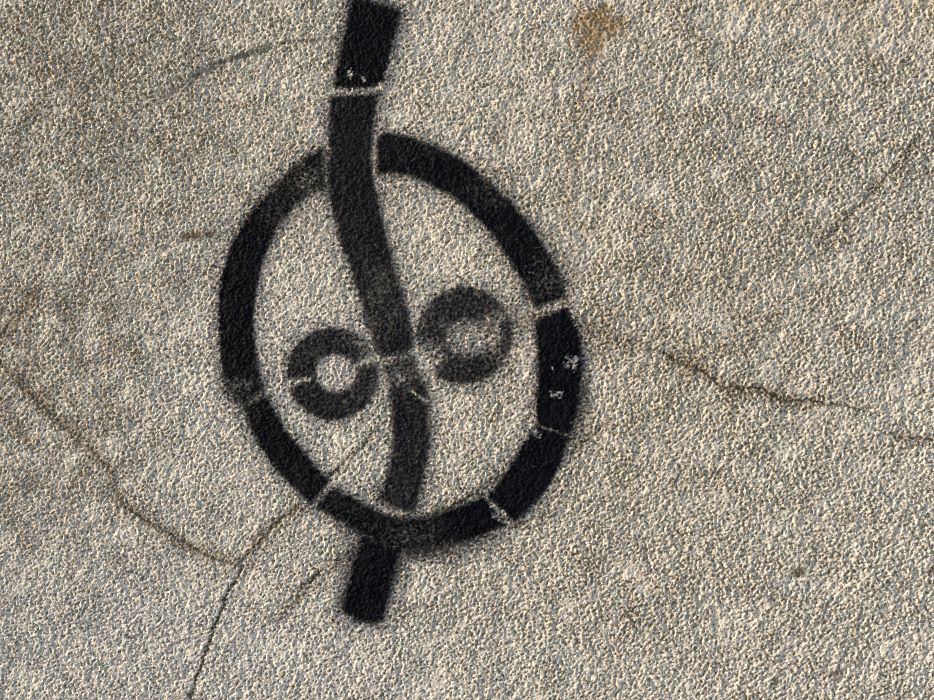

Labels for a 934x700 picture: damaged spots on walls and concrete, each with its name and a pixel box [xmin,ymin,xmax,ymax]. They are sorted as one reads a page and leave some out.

rust [573,4,624,50]
crack [663,352,856,409]
crack [1,361,302,700]